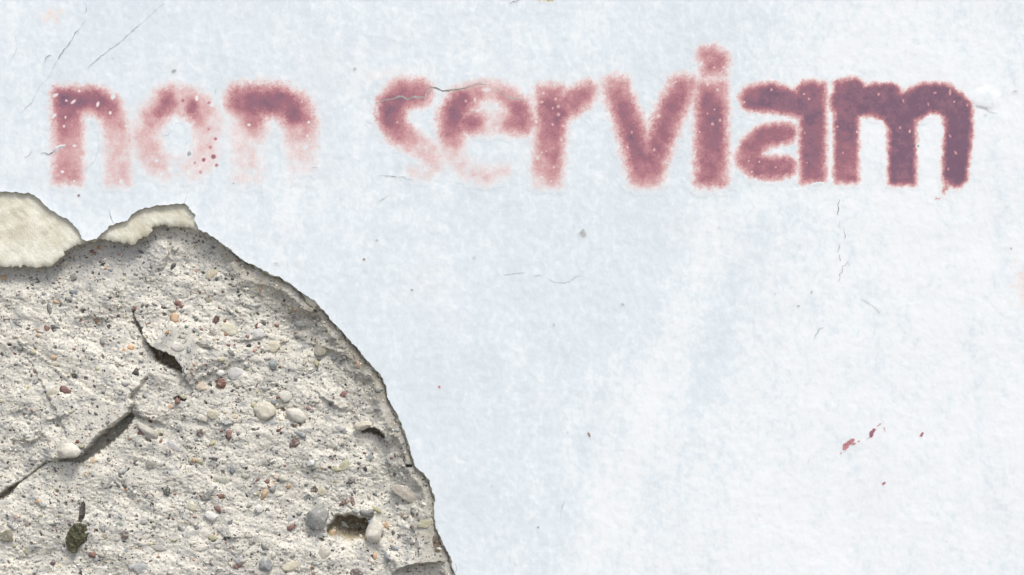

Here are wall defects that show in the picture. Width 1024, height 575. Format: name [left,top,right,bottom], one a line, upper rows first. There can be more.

crack [375,83,523,104]
crack [132,309,182,372]
spalling [0,191,455,575]
crack [0,413,135,500]